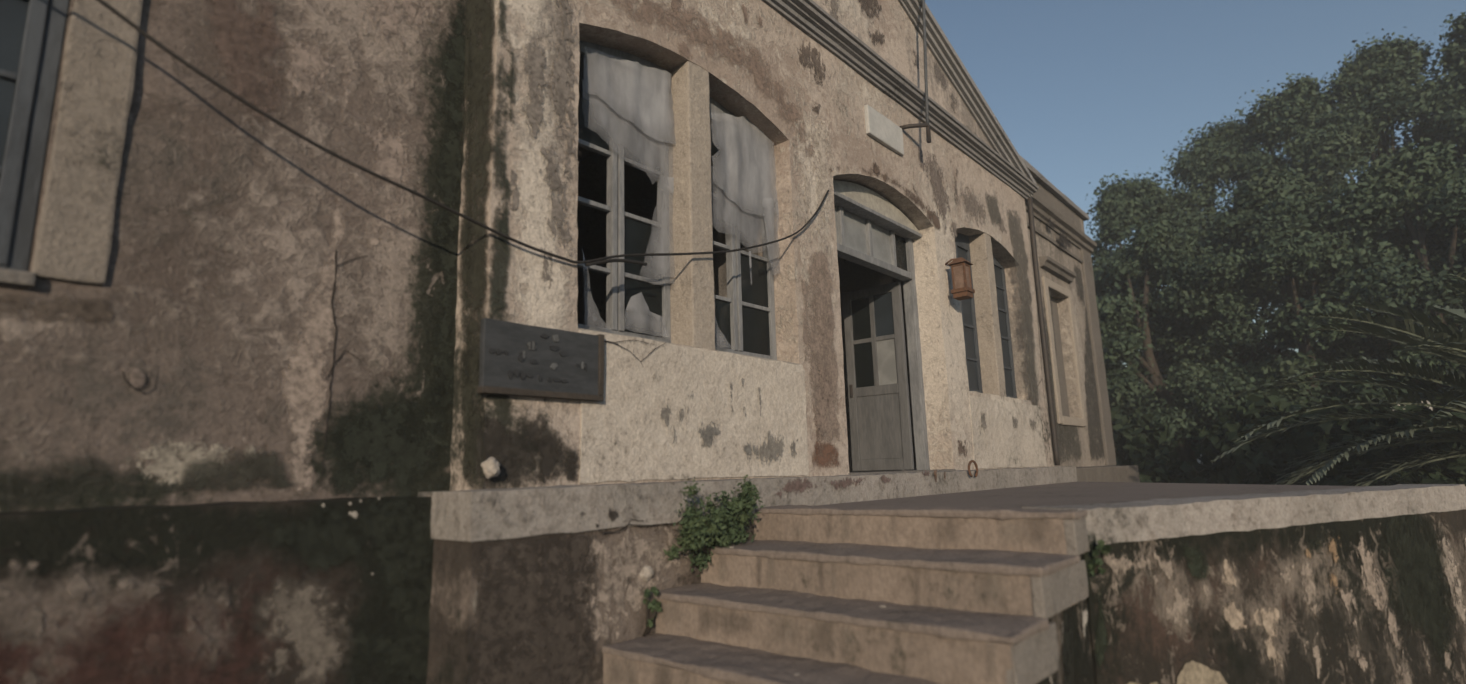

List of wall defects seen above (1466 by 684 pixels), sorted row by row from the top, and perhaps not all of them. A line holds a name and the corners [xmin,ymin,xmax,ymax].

leakage [182,452,293,490]
crack [320,250,368,486]
leakage [258,0,597,684]
spalling [1177,660,1228,684]